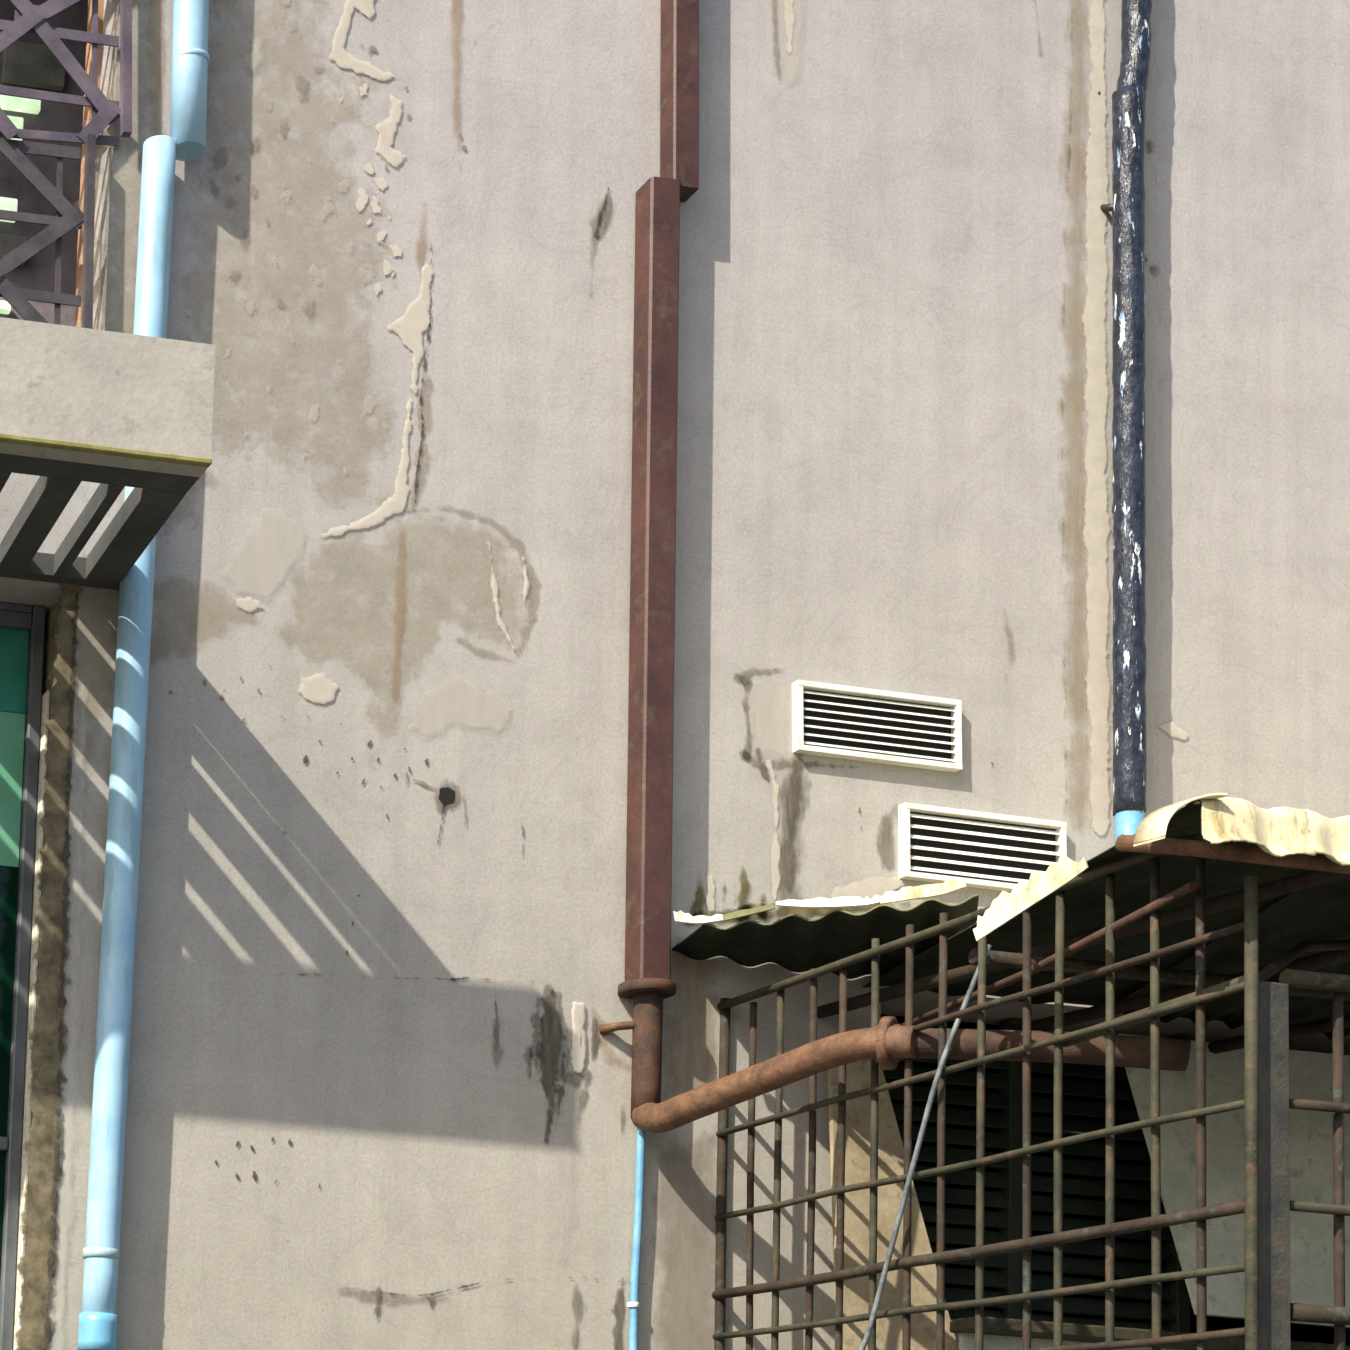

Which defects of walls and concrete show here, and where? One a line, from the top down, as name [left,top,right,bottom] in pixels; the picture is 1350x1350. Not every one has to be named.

peeling [295,0,411,294]
peeling [321,263,433,537]
crack [414,248,432,503]
water stain [1082,0,1111,835]
peeling [298,673,338,718]
spalling [394,758,467,843]
water stain [686,748,909,926]
peeling [1159,722,1188,740]
water stain [525,984,590,1143]
crack [344,1278,510,1319]